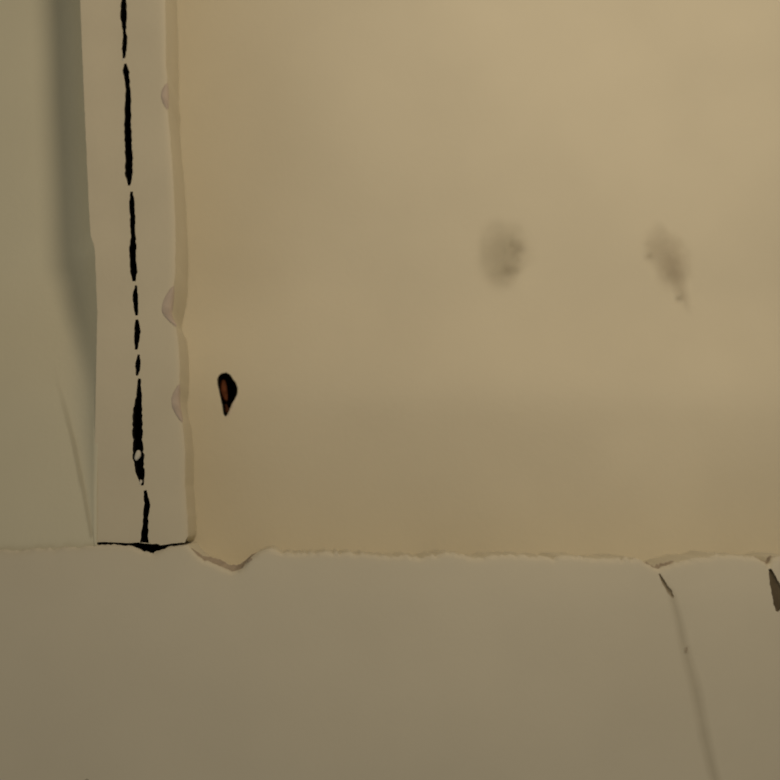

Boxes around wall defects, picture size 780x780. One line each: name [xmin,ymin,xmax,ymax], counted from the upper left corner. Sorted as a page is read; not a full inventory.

crack [120,0,150,543]
crack [659,574,674,598]
crack [769,569,780,612]